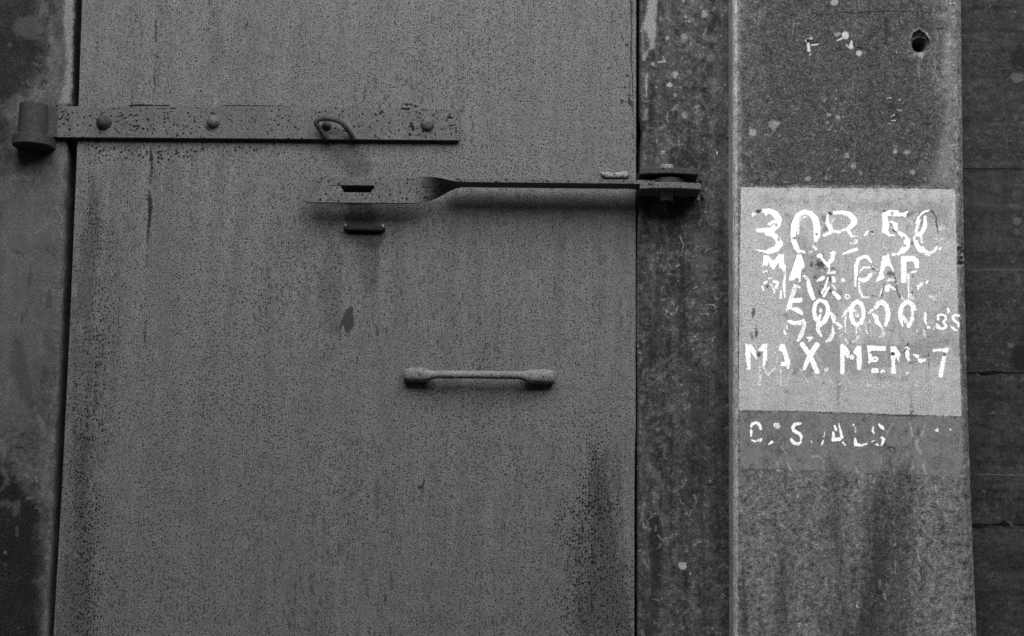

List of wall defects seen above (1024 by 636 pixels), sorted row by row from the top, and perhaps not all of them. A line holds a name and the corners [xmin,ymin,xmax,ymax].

water stain [0,470,42,636]